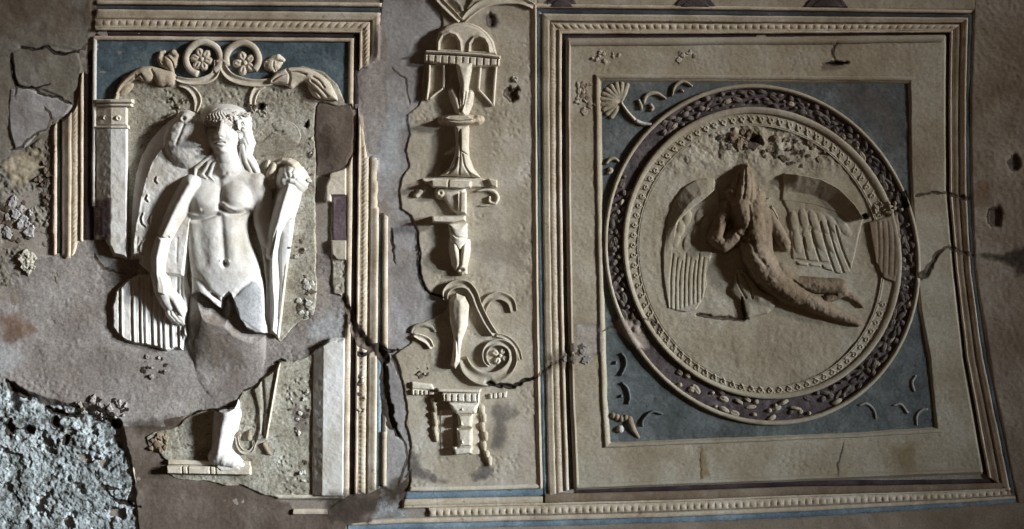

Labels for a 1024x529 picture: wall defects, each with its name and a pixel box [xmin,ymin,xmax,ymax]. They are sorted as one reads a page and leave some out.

spalling [504,76,519,102]
flaking render [717,129,826,168]
flaking render [0,135,54,287]
crack [916,191,968,201]
crack [919,246,974,279]
crack [192,387,253,415]
crack [315,295,408,485]
crack [486,360,561,389]
spalling [6,418,35,436]
spalling [52,394,129,445]